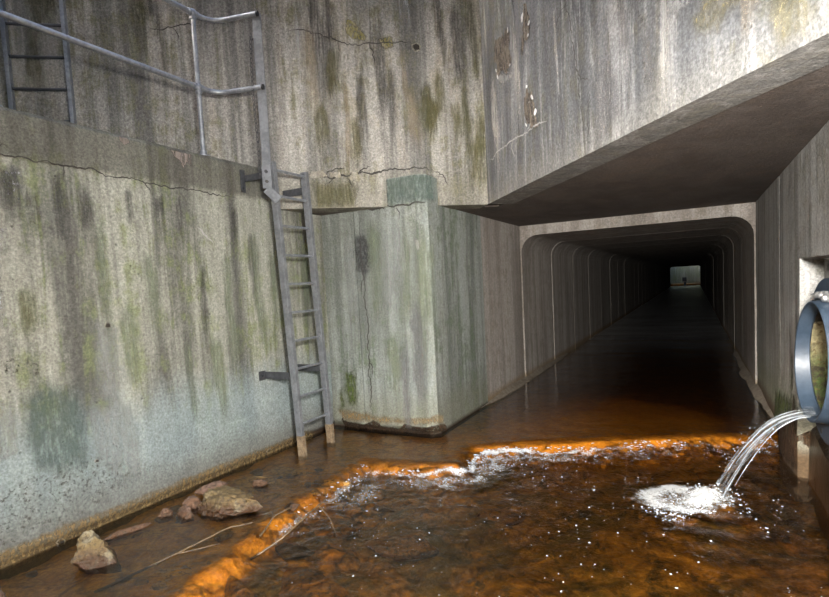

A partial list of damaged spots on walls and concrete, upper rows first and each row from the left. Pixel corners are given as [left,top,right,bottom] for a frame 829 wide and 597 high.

crack [290,29,412,62]
damp [372,28,395,125]
spalling [494,27,511,79]
spalling [521,2,530,55]
spalling [524,85,539,128]
crack [490,121,546,162]
crack [0,143,238,198]
crack [309,166,447,187]
crack [359,201,425,414]